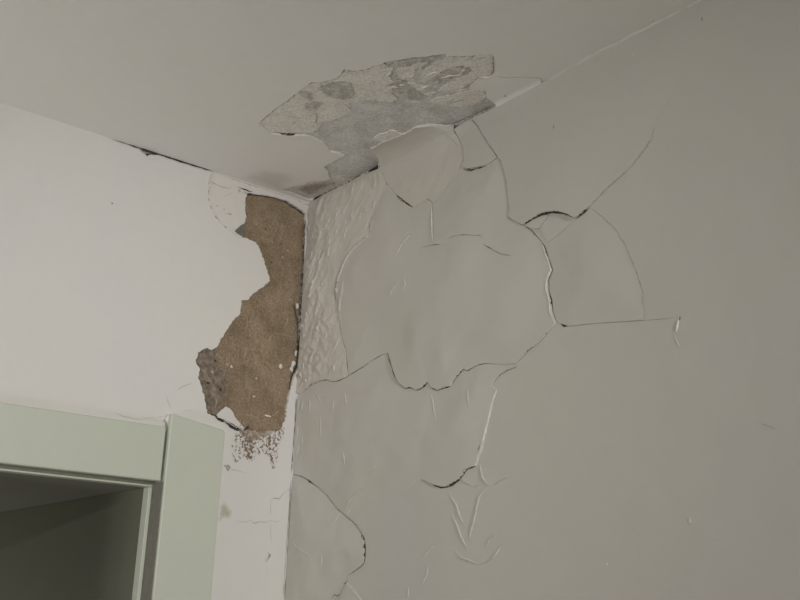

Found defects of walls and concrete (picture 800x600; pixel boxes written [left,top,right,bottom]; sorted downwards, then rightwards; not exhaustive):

crack [118,141,214,172]
peeling [196,2,703,516]
crack [239,196,676,597]